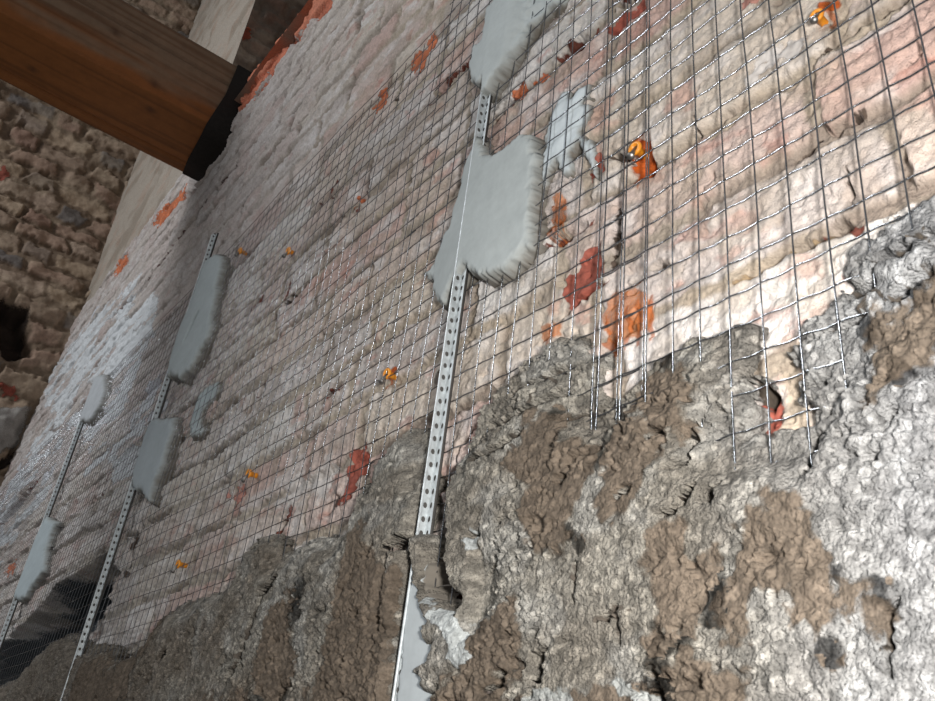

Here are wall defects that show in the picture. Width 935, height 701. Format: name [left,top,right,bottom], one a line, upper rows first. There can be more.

spalling [238,0,333,112]
spalling [563,243,604,310]
spalling [0,299,30,362]
spalling [337,442,370,506]